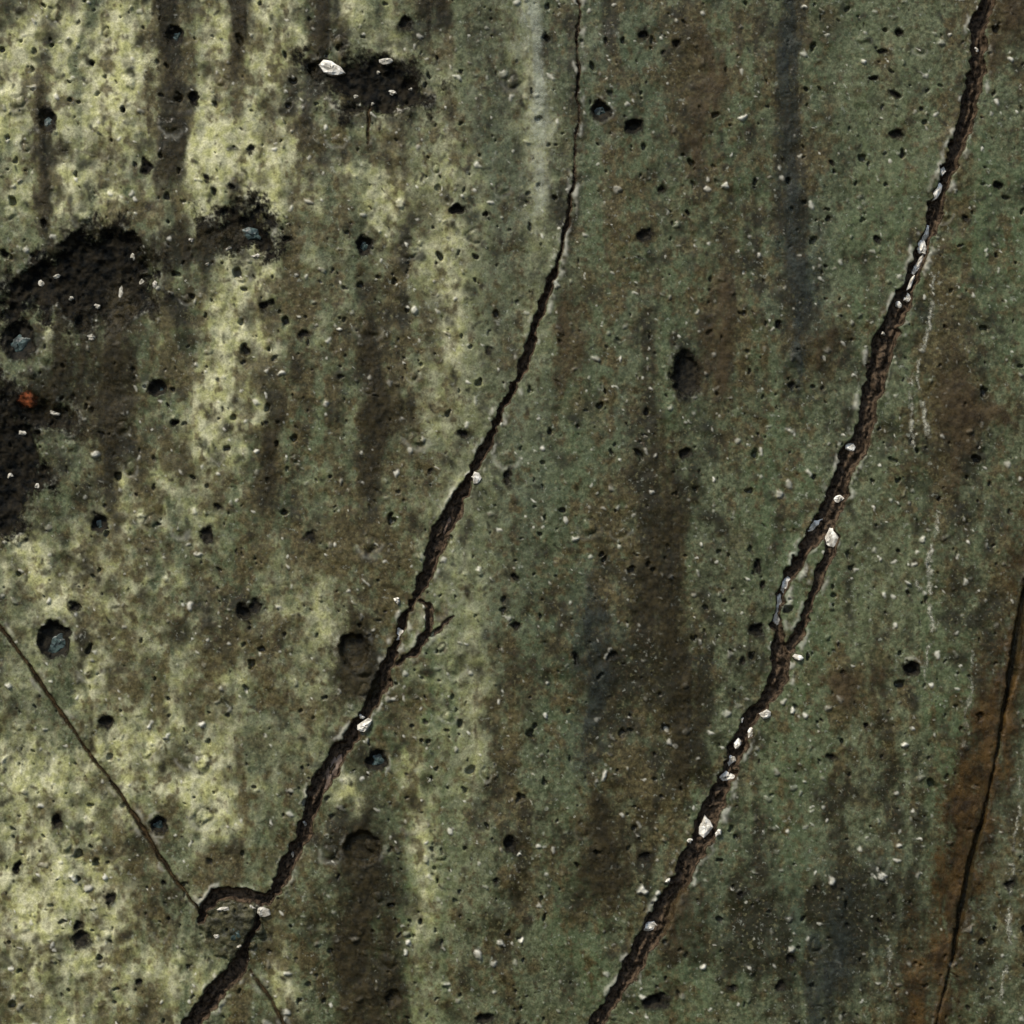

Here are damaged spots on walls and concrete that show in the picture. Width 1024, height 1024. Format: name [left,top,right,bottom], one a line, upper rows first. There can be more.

leakage [41,281,138,475]
crack [0,0,581,1024]
crack [589,0,995,1024]